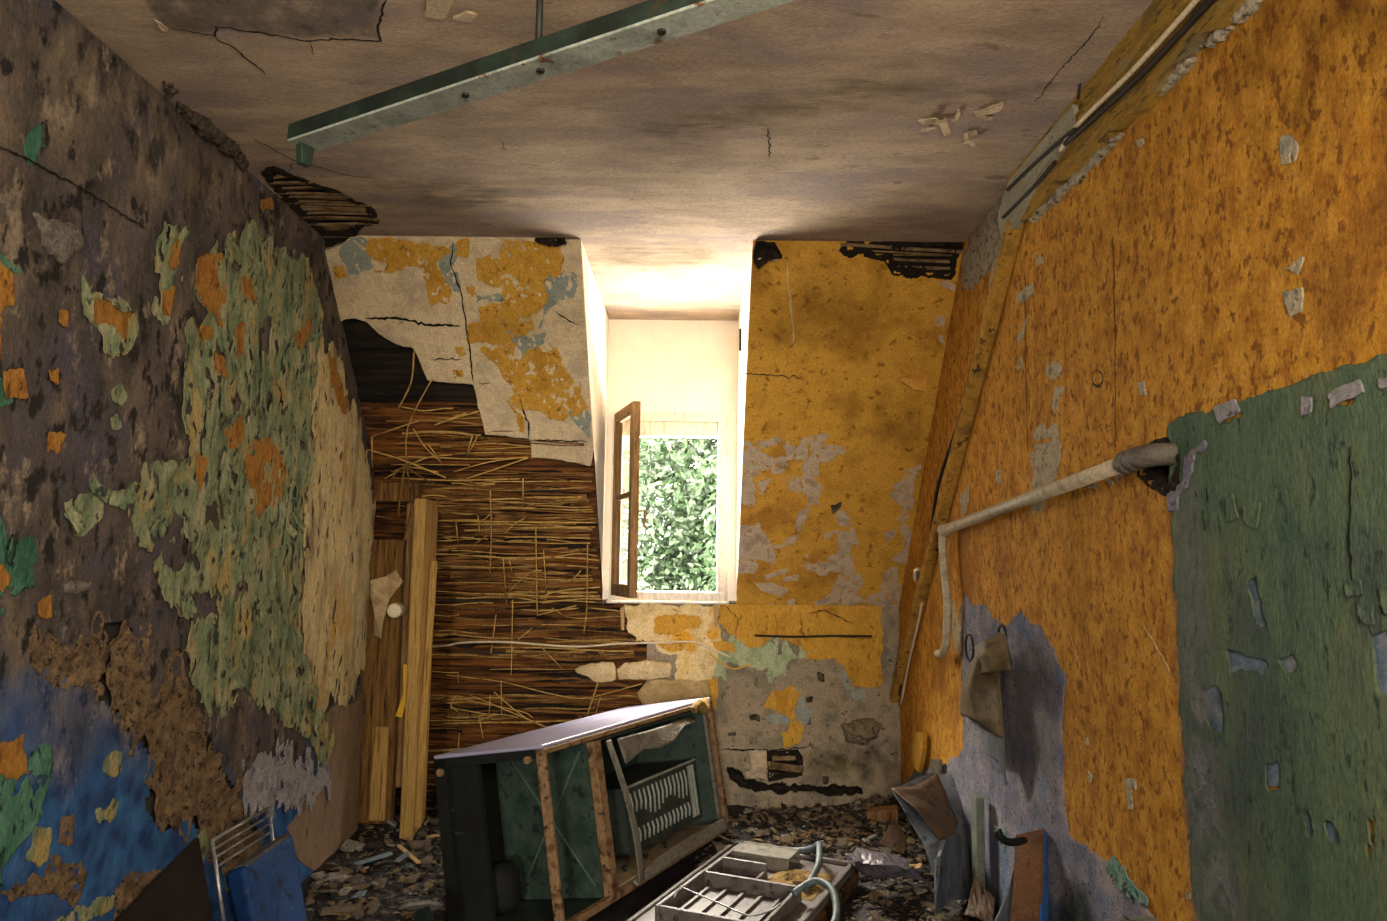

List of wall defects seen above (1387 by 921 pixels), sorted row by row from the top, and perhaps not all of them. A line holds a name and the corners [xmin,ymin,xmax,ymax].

crack [172,0,387,75]
crack [365,245,487,385]
flaking render [535,238,567,247]
flaking render [753,241,782,269]
flaking render [832,195,1003,294]
peeling [0,81,379,921]
peeling [738,432,921,607]
flaking render [1030,361,1064,515]
peeling [712,634,824,726]
peeling [1087,353,1387,921]
flaking render [726,749,863,797]
flaking render [907,594,1155,921]